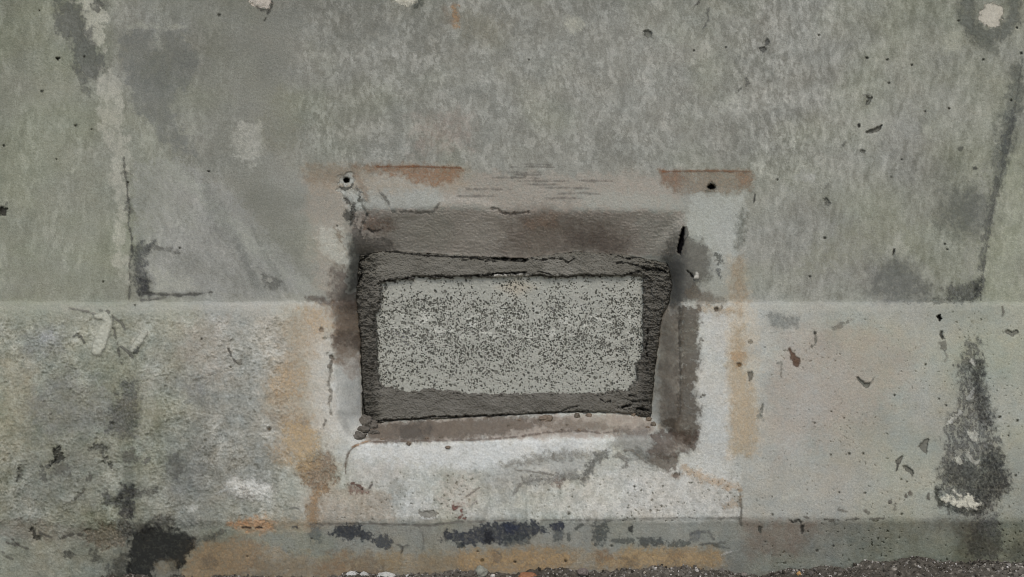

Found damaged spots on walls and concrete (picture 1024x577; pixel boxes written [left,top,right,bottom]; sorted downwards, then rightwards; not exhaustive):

rust [355,165,462,194]
rust [659,169,752,194]
water stain [368,234,723,489]
water stain [935,338,1024,560]
water stain [102,483,226,577]